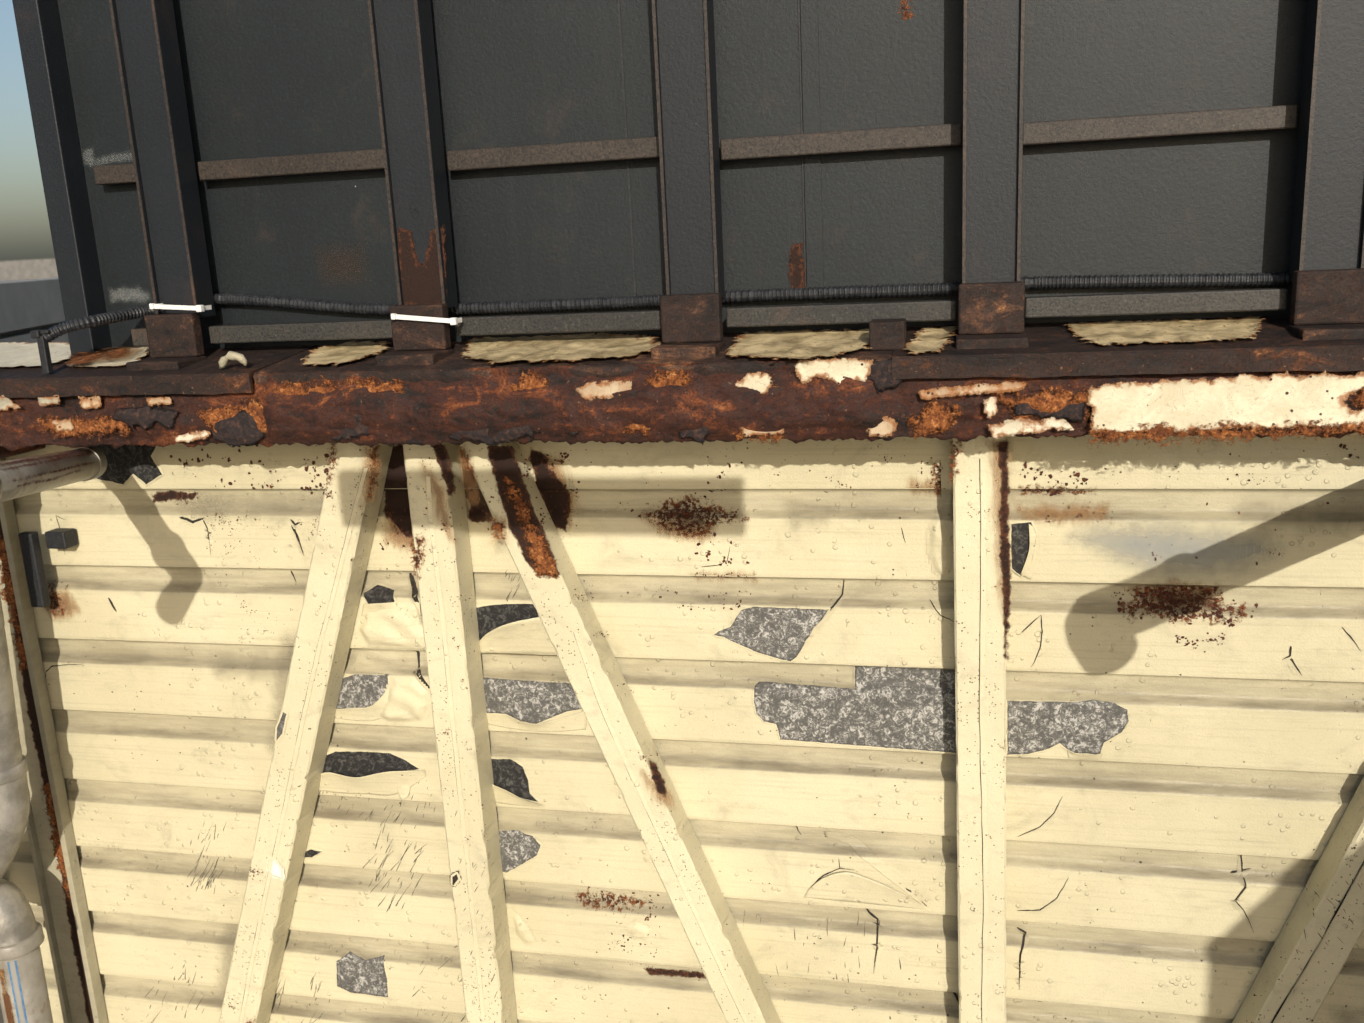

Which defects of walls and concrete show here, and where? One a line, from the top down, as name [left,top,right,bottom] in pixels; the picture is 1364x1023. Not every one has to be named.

corrosion [1086,416,1364,466]
corrosion [300,443,603,579]
peeling [711,604,831,663]
corrosion [1111,583,1258,649]
crack [1282,646,1302,676]
peeling [751,664,956,754]
peeling [1005,696,1131,760]
peeling [319,749,426,800]
crack [1229,855,1254,933]
peeling [335,948,390,999]
corrosion [576,886,706,981]
crack [1271,861,1364,1023]